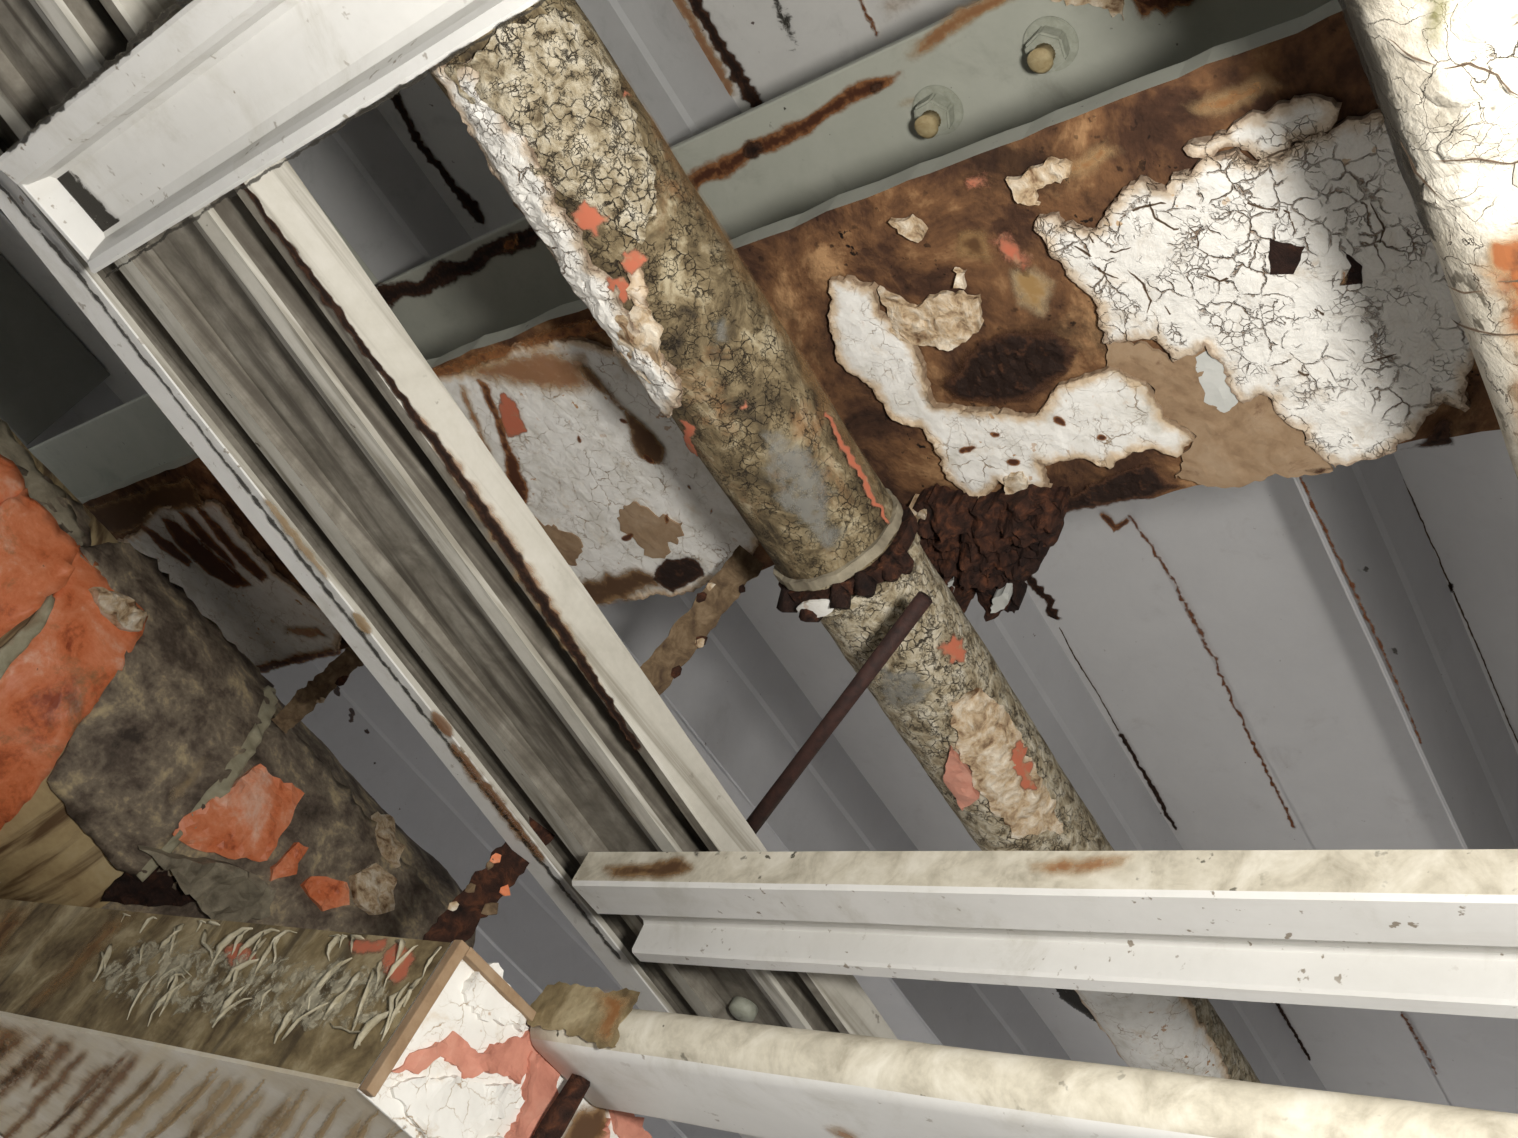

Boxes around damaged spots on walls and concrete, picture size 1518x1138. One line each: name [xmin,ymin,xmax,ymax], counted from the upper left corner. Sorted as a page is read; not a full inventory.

corrosion [687,76,895,191]
crack [1388,38,1518,96]
crack [1400,141,1518,197]
peeling [429,7,760,605]
peeling [827,93,1475,498]
crack [1448,280,1518,336]
corrosion [87,477,267,588]
corrosion [240,182,665,750]
corrosion [909,464,1185,622]
peeling [943,687,1064,839]
water stain [0,1029,346,1138]
peeling [390,963,560,1138]